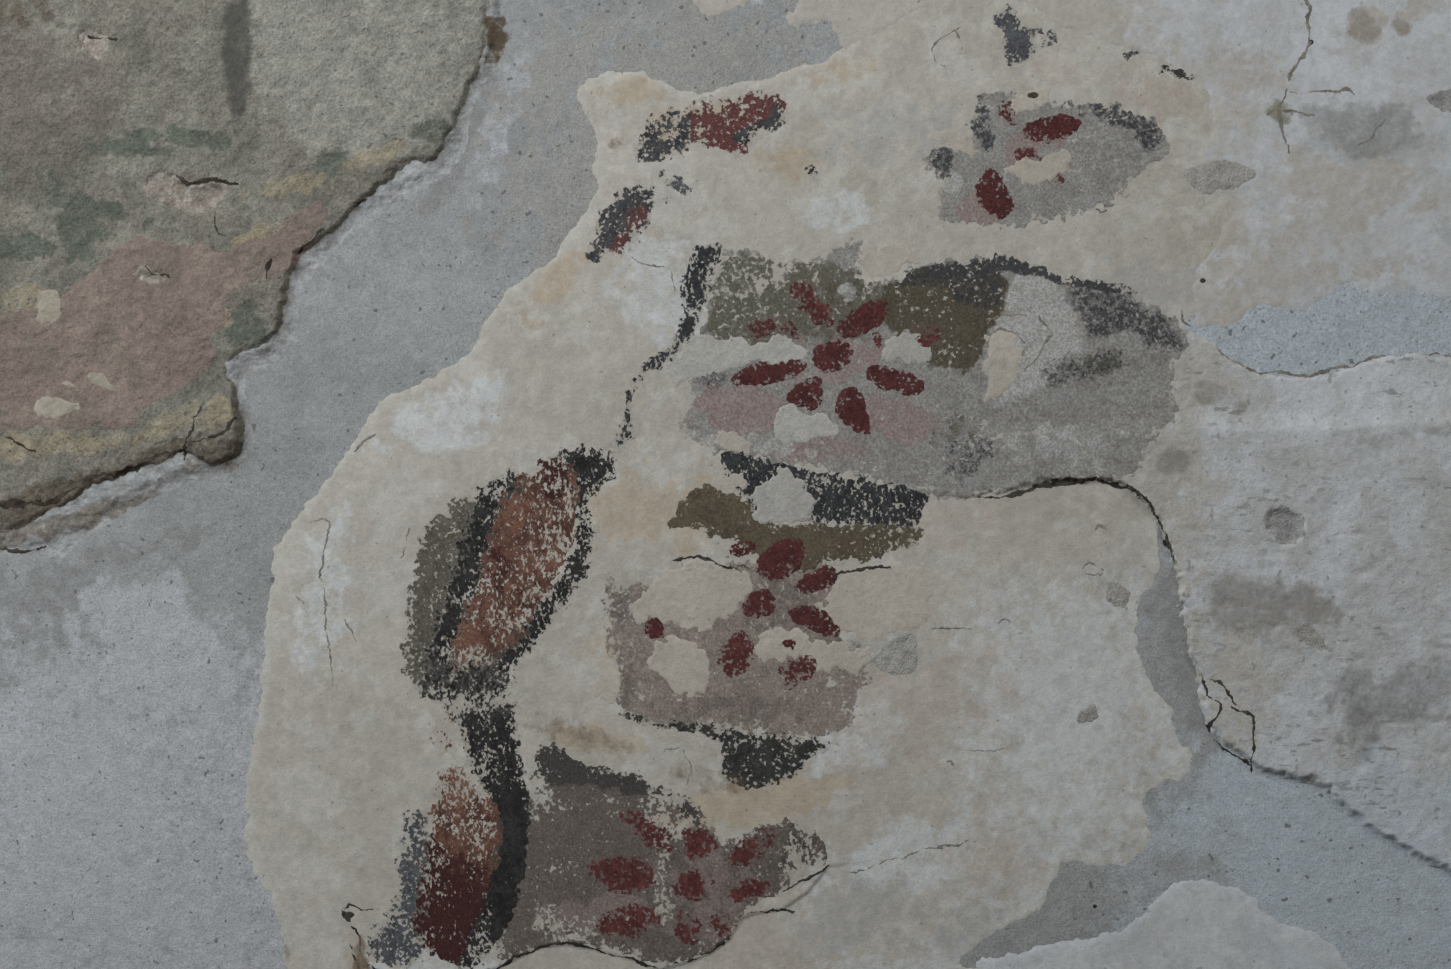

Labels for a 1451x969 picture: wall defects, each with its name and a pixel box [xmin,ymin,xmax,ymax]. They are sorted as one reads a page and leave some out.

crack [1266,0,1355,154]
flaking render [1426,88,1451,113]
crack [1346,118,1386,152]
flaking render [142,171,228,214]
peeling [36,289,61,324]
peeling [34,372,116,418]
crack [978,476,1177,563]
flaking render [1265,504,1306,545]
crack [1082,524,1108,576]
peeling [589,657,622,704]
flaking render [1077,704,1099,724]
crack [1201,673,1256,774]